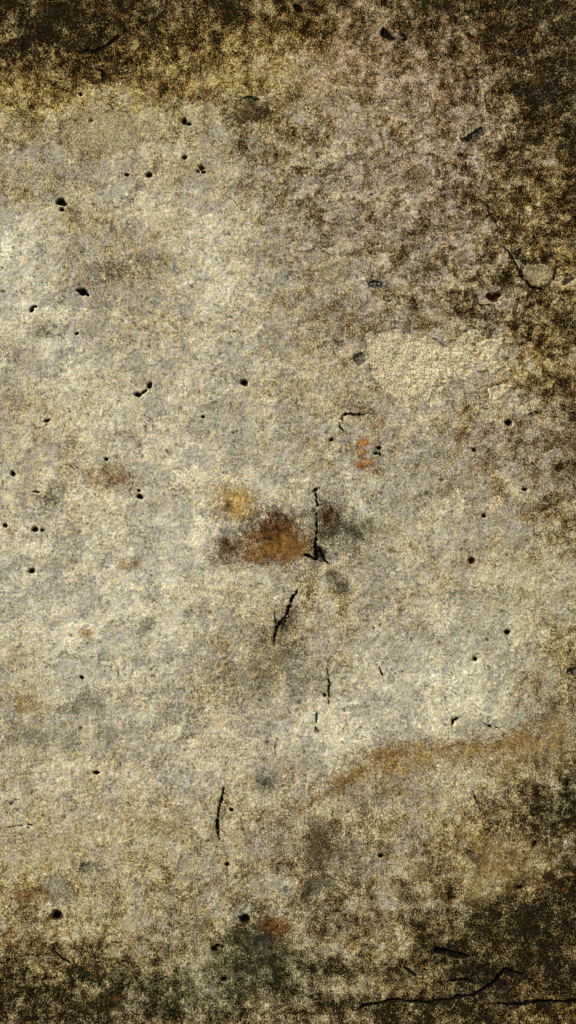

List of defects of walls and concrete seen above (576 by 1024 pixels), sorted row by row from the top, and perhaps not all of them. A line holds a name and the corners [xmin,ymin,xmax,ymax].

corrosion [356,439,375,473]
corrosion [213,484,344,564]
crack [303,487,330,564]
crack [273,589,298,644]
corrosion [327,723,567,794]
crack [215,787,225,847]
water stain [222,925,286,976]
crack [351,967,576,1011]